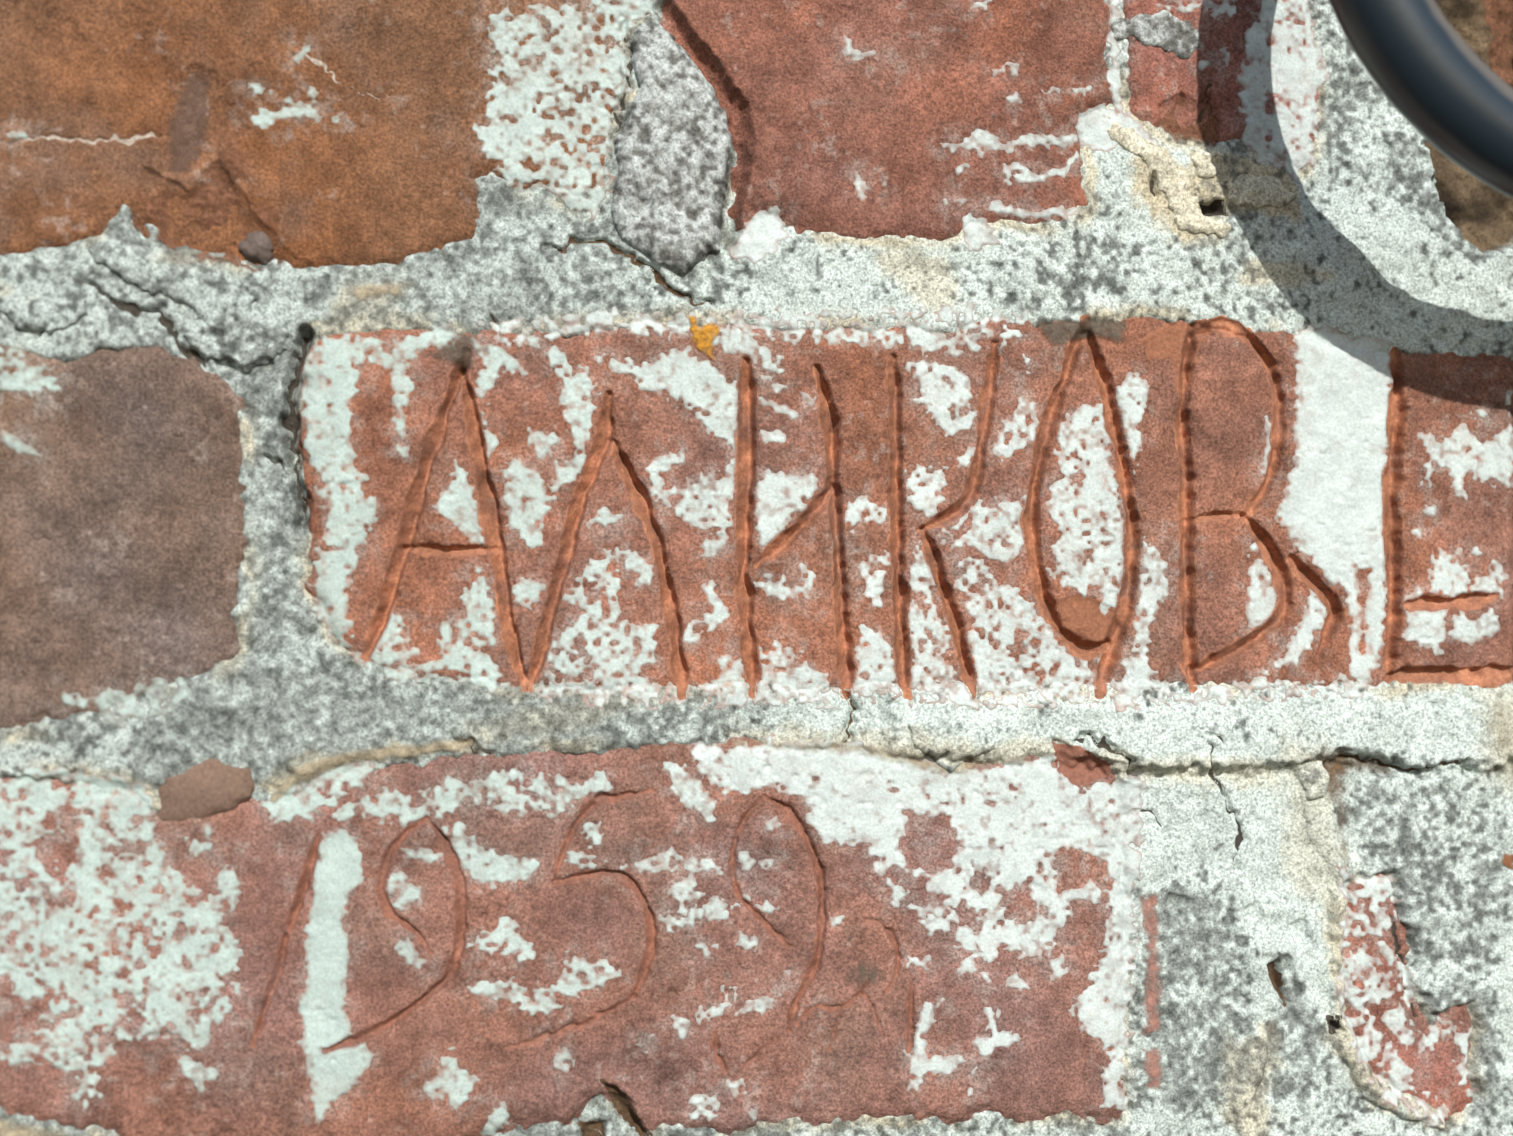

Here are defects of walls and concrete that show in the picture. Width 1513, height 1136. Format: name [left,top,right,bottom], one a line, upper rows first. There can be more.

crack [0,132,157,148]
peeling [472,0,665,221]
peeling [940,0,1220,252]
peeling [298,302,1513,712]
peeling [0,761,244,1109]
peeling [258,760,622,1124]
peeling [564,821,780,959]
peeling [662,733,1149,1111]
crack [1075,733,1162,827]
crack [1205,733,1243,870]
peeling [1325,865,1480,1128]
crack [1342,755,1468,772]